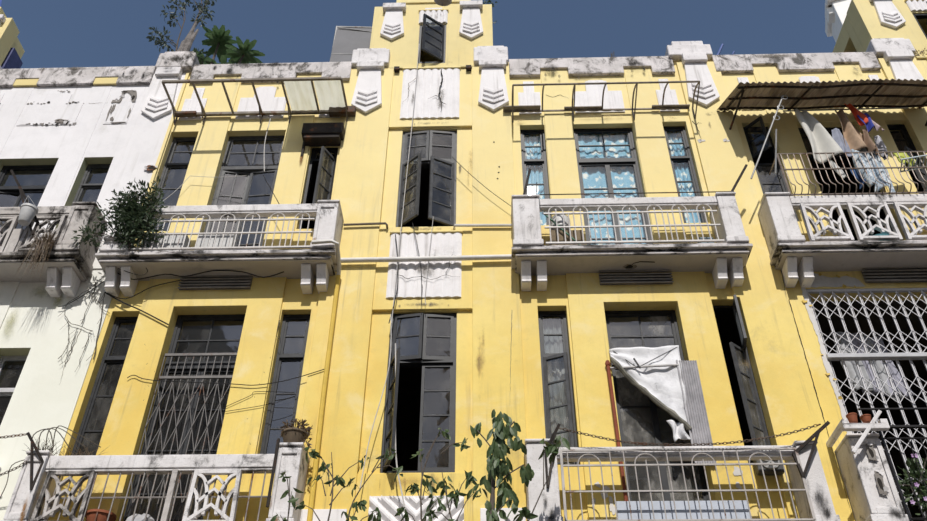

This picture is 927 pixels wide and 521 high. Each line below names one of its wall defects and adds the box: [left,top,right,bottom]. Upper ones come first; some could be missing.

flaking render [106,89,137,123]
crack [433,69,445,110]